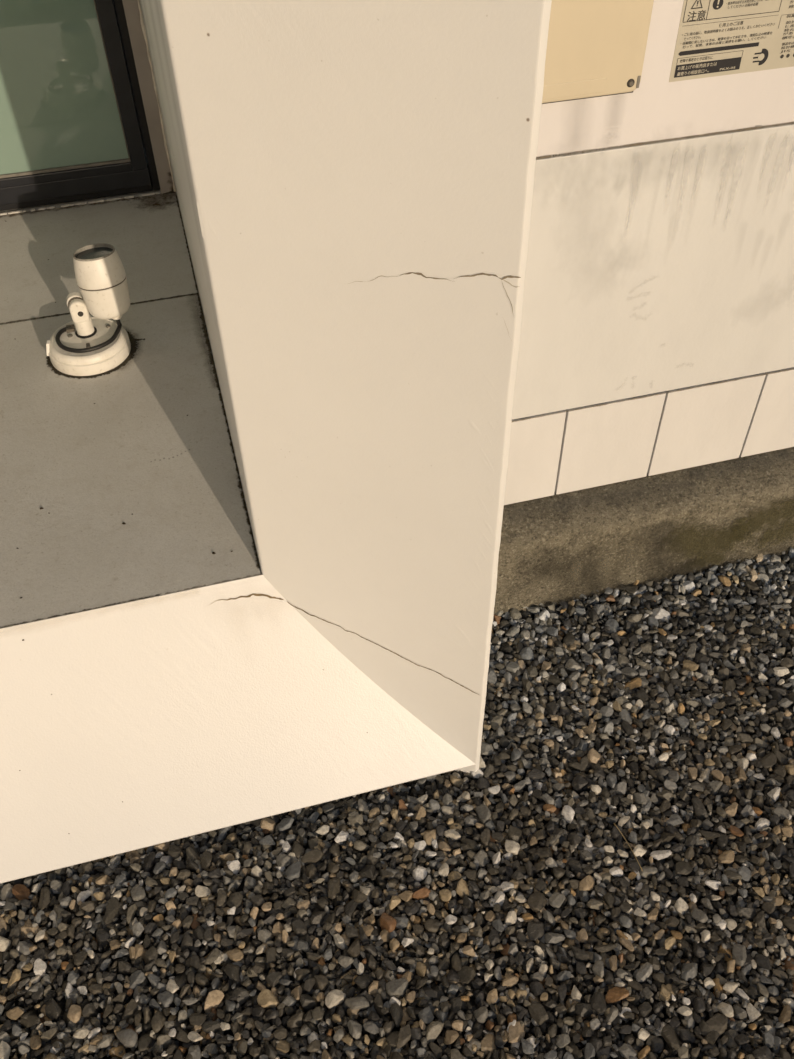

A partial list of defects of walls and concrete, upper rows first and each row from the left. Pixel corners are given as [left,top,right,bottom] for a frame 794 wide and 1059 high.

damp [536,122,794,159]
crack [348,269,521,341]
damp [512,369,794,422]
crack [210,594,479,695]